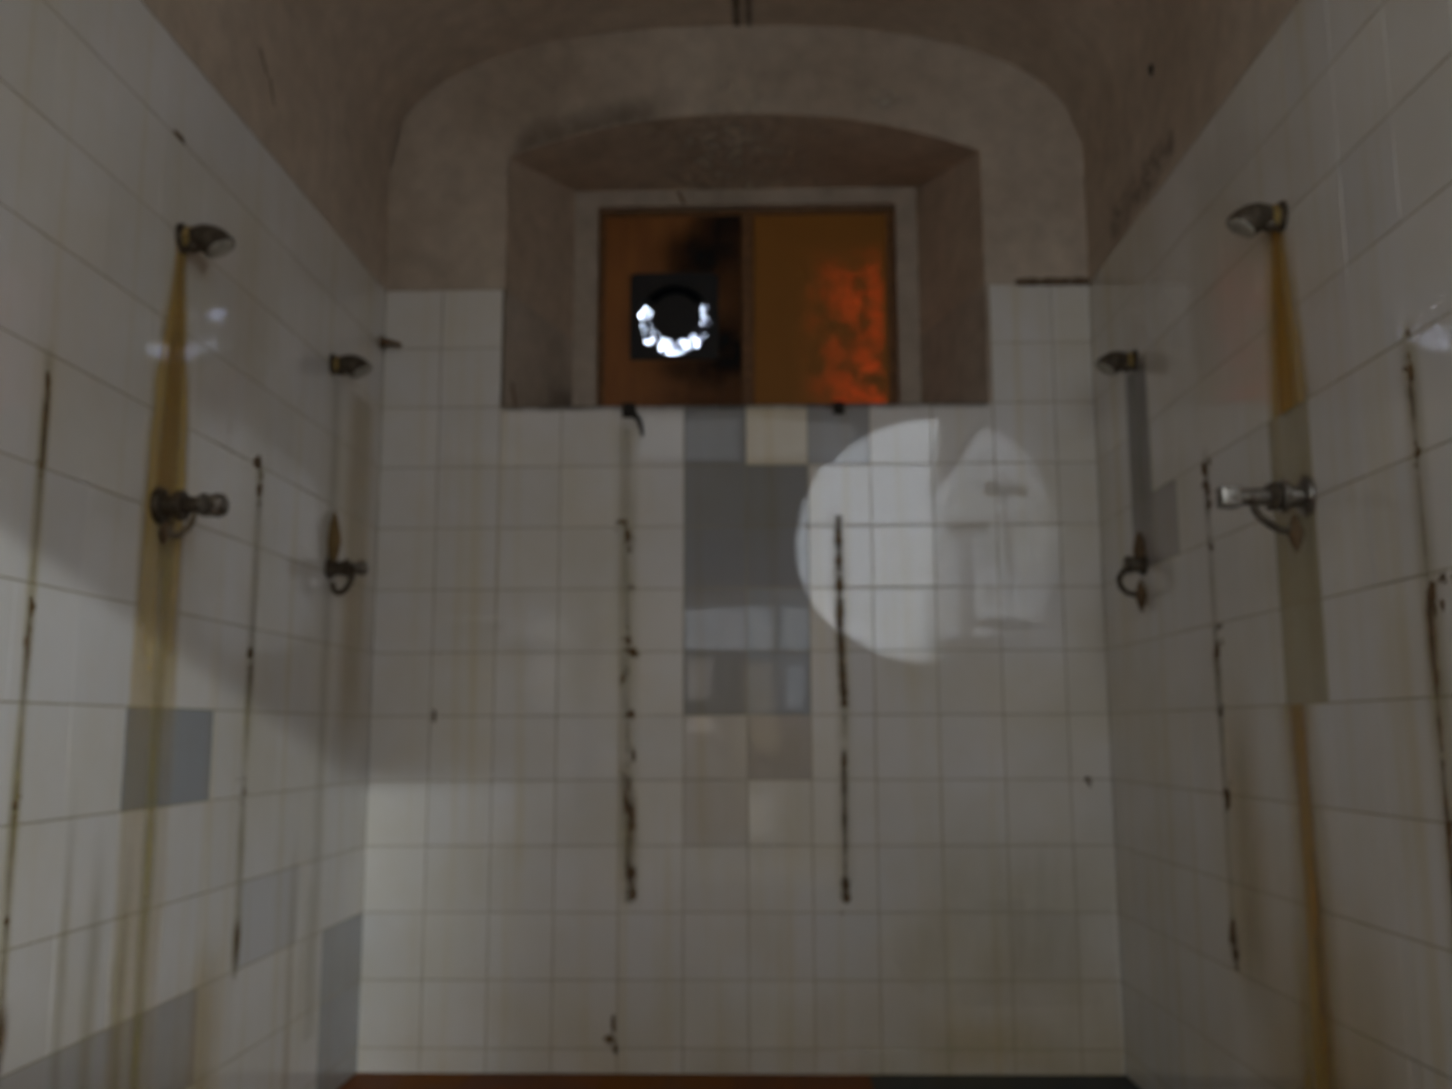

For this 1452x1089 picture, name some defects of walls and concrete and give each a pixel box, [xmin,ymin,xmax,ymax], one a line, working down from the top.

corrosion [1272,231,1304,417]
crack [1402,329,1415,394]
crack [36,371,51,478]
corrosion [143,272,187,617]
crack [1201,457,1214,551]
crack [23,596,36,656]
crack [620,625,640,832]
crack [834,517,851,915]
crack [1427,573,1452,882]
crack [12,775,22,832]
crack [626,867,637,901]
crack [0,1021,8,1049]